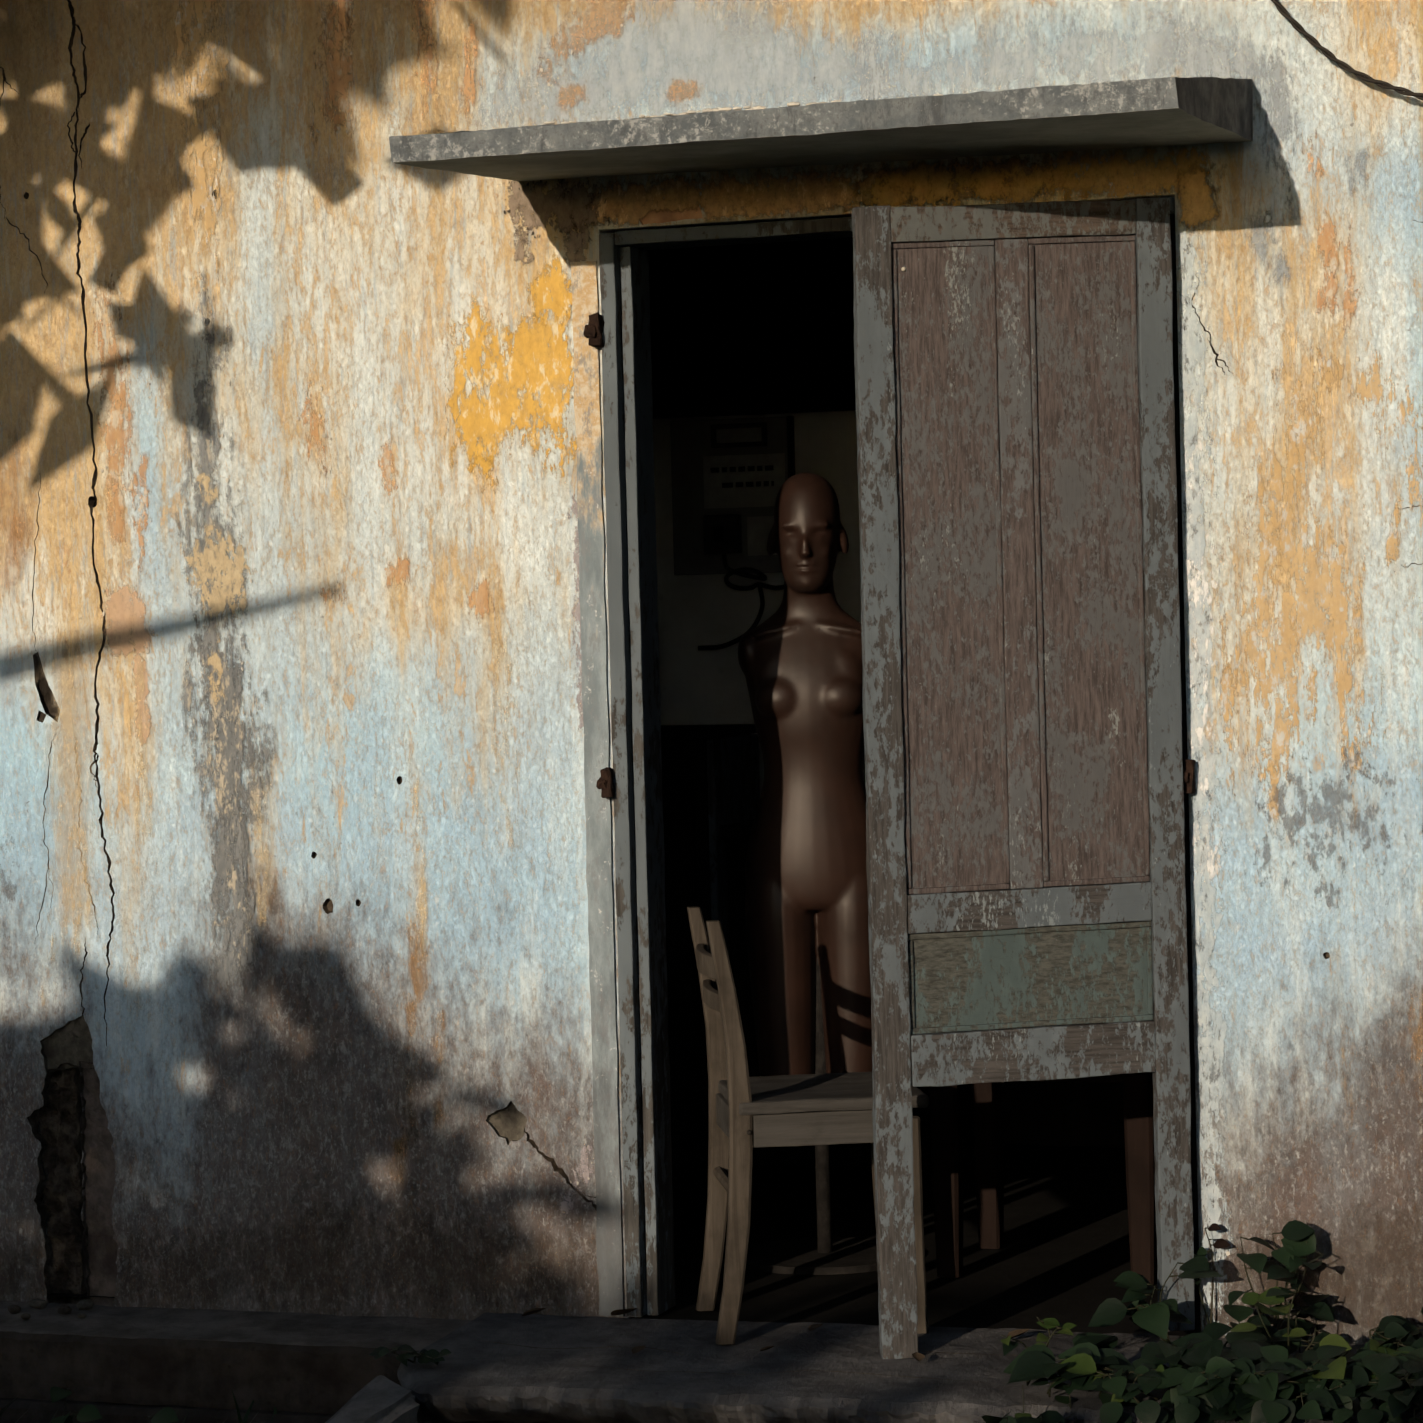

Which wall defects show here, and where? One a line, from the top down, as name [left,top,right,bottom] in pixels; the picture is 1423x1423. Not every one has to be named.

peeling [445,179,610,489]
crack [1177,273,1233,375]
flaking render [33,652,60,723]
crack [0,0,115,1046]
peeling [568,495,584,729]
flaking render [27,1015,118,1307]
flaking render [486,1101,527,1145]
peeling [557,1139,594,1217]